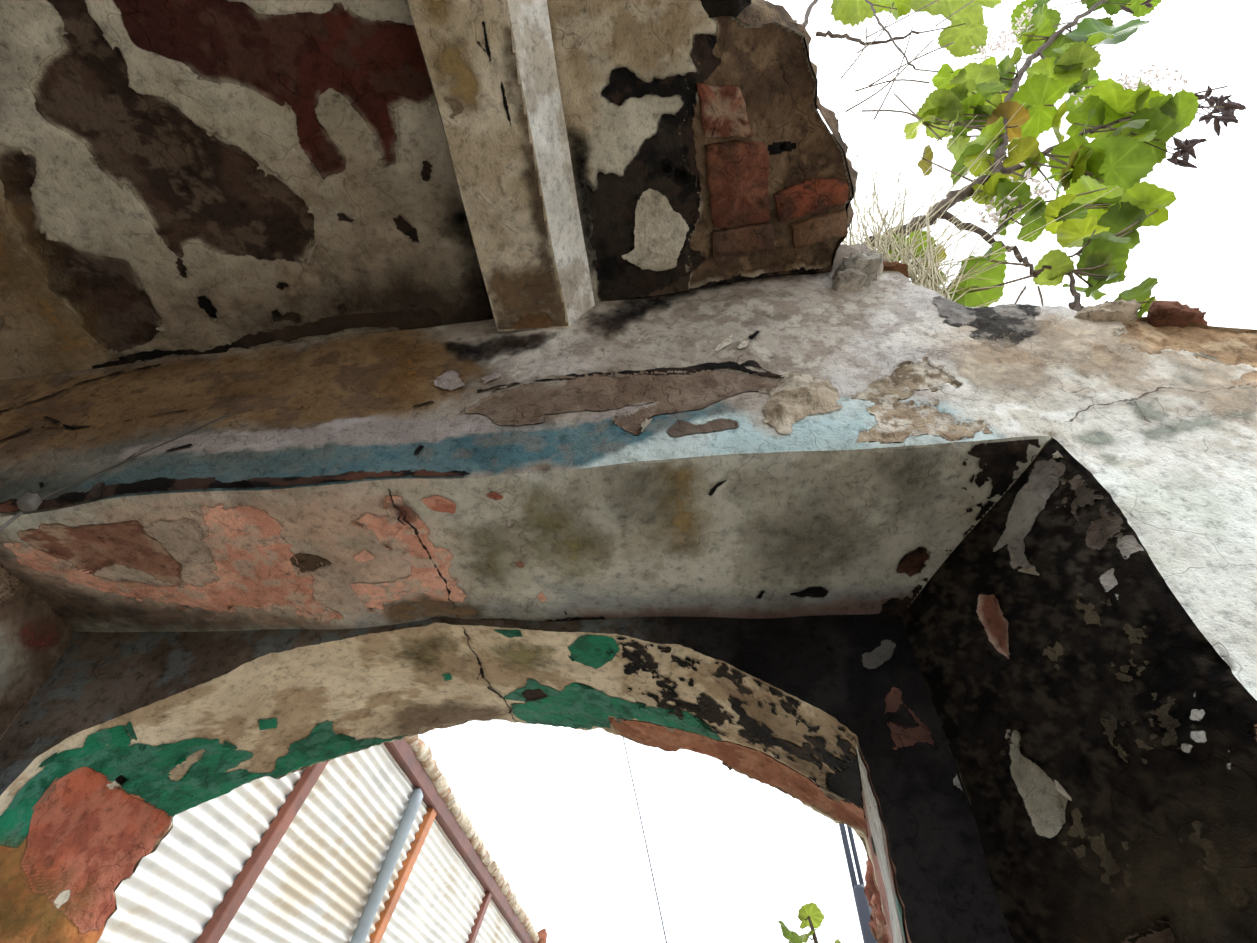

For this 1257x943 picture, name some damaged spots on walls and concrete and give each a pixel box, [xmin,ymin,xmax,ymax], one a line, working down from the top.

spalling [622,0,909,291]
peeling [0,504,344,624]
crack [166,444,192,452]
crack [0,310,442,441]
spalling [37,469,471,510]
crack [388,489,517,722]
crack [546,615,596,623]
peeling [458,369,782,436]
peeling [993,451,1144,599]
peeling [0,721,405,933]
water stain [606,636,867,827]
peeling [1005,729,1072,838]